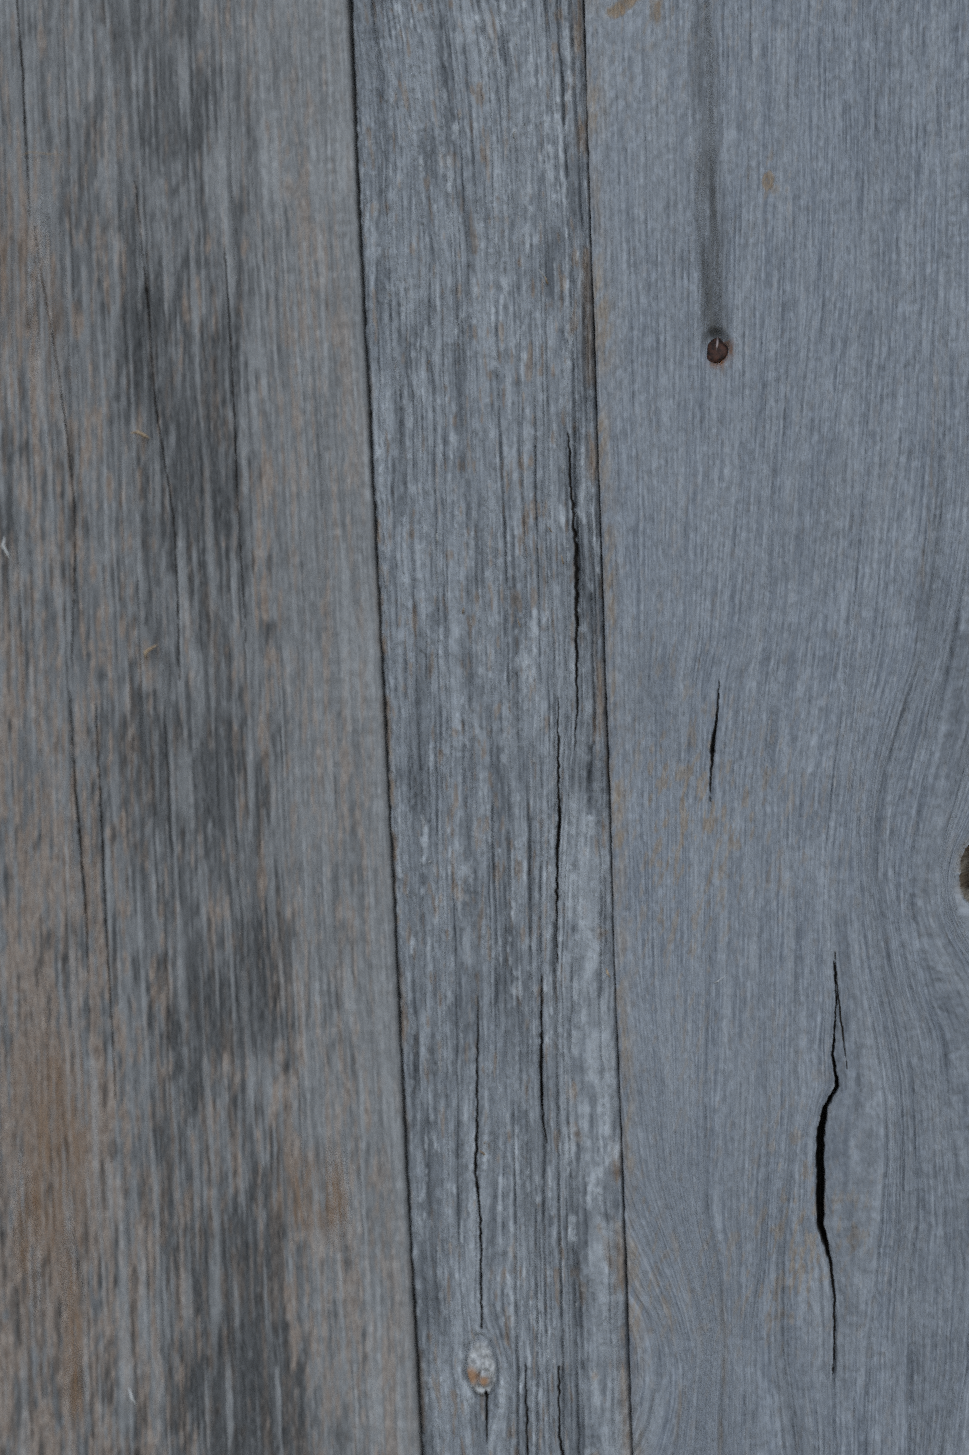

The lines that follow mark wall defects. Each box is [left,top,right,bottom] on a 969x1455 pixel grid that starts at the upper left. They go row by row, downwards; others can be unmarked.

crack [815,952,847,1375]